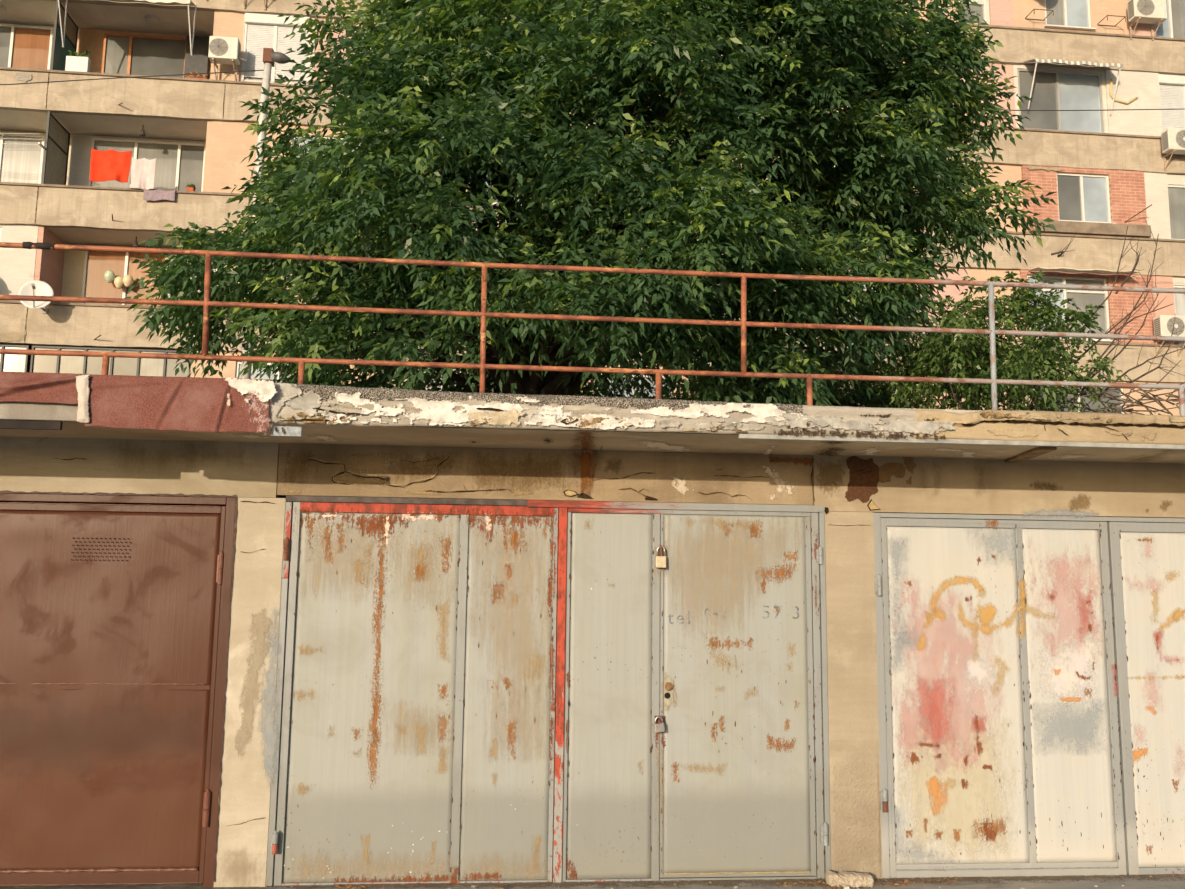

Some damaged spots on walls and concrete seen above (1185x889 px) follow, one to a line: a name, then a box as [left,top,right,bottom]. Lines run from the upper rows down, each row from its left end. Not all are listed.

peeling [225,378,955,444]
crack [301,454,511,493]
crack [595,452,683,497]
crack [698,469,772,500]
flaking render [845,456,916,511]
rust [755,552,797,593]
rust [293,507,556,789]
rust [709,636,753,665]
rust [532,636,571,772]
rust [767,720,796,753]
rust [906,714,1006,842]
rust [334,868,506,886]